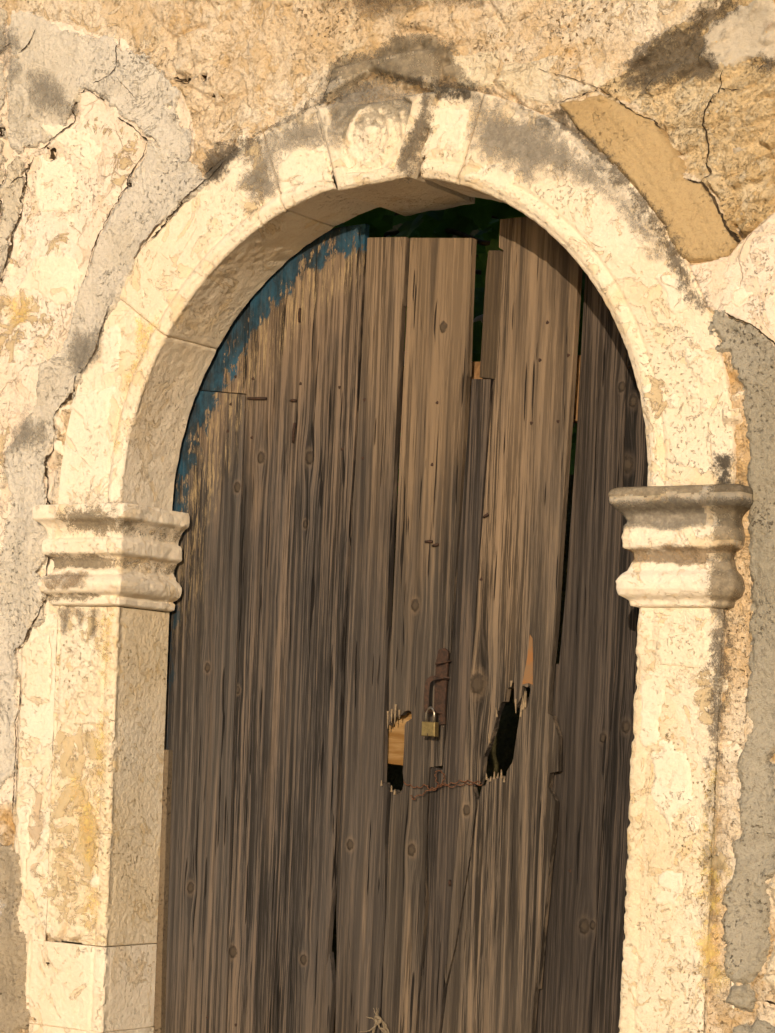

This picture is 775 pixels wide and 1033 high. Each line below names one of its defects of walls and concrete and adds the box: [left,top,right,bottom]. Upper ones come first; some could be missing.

peeling [0,112,147,363]
flaking render [599,0,775,239]
crack [684,62,741,243]
peeling [56,325,122,433]
peeling [21,635,52,706]
flaking render [57,606,115,660]
flaking render [16,725,108,931]
flaking render [654,845,733,981]